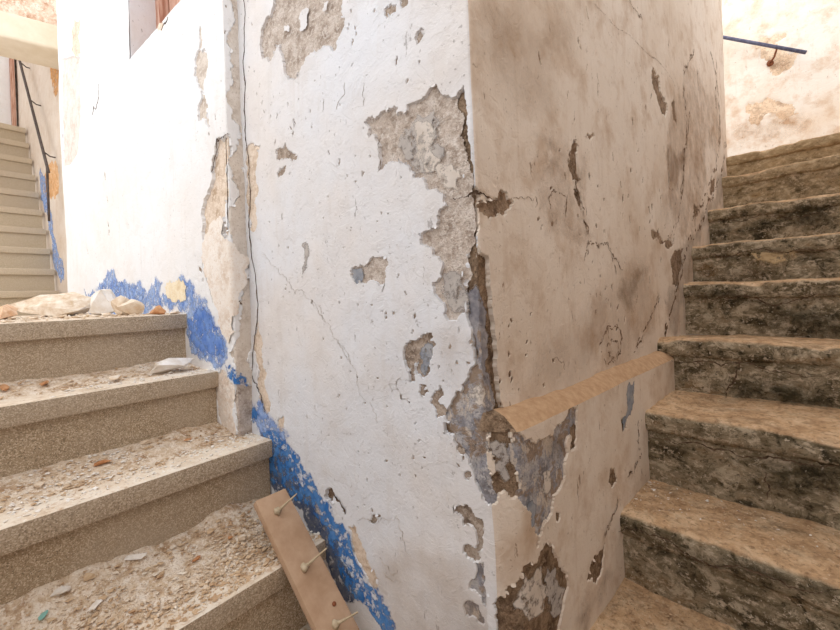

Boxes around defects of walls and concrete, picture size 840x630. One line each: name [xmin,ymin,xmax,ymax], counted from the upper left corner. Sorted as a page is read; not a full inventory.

flaking render [195,27,216,127]
flaking render [262,0,357,80]
peeling [651,70,676,122]
flaking render [204,0,271,437]
peeling [276,145,297,176]
crack [453,190,490,200]
crack [568,136,620,275]
flaking render [352,256,388,287]
flaking render [368,83,576,535]
flaking render [350,505,406,590]
peeling [453,504,567,630]
peeling [587,547,604,583]